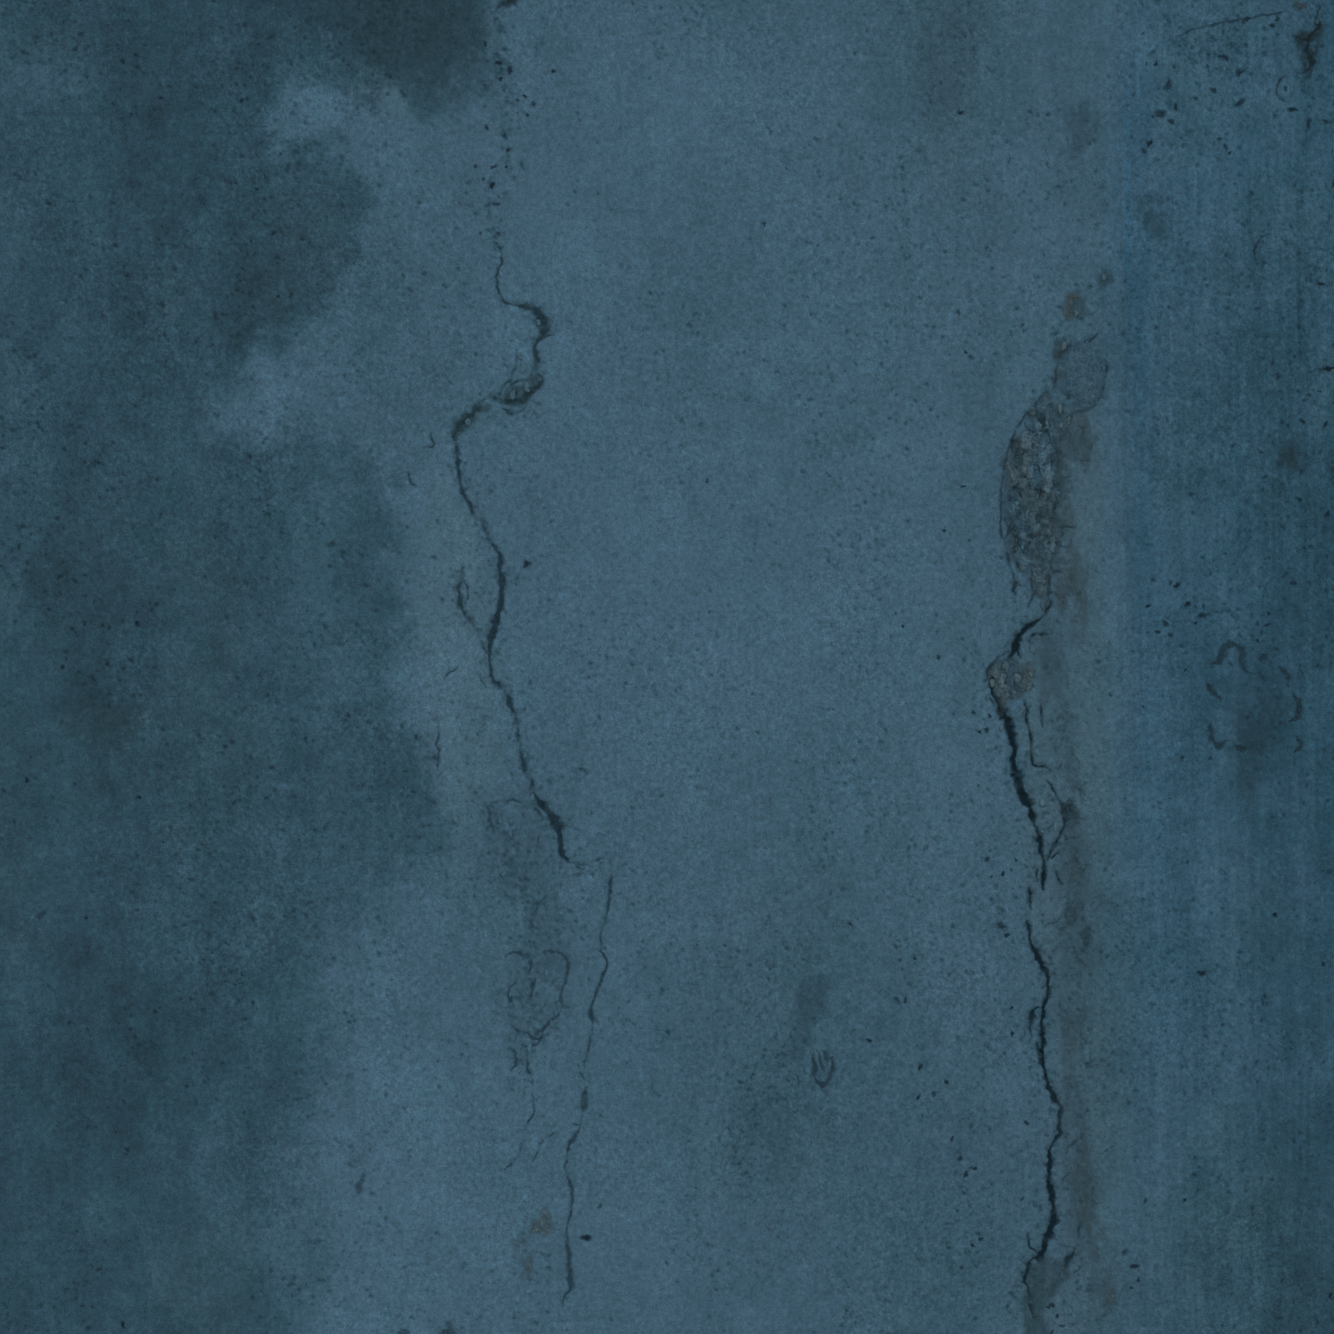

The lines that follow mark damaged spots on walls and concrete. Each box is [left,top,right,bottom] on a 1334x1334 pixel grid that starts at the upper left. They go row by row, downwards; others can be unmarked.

crack [430,247,613,1051]
crack [563,1090,587,1301]
spalling [1000,391,1069,611]
crack [990,602,1081,1315]